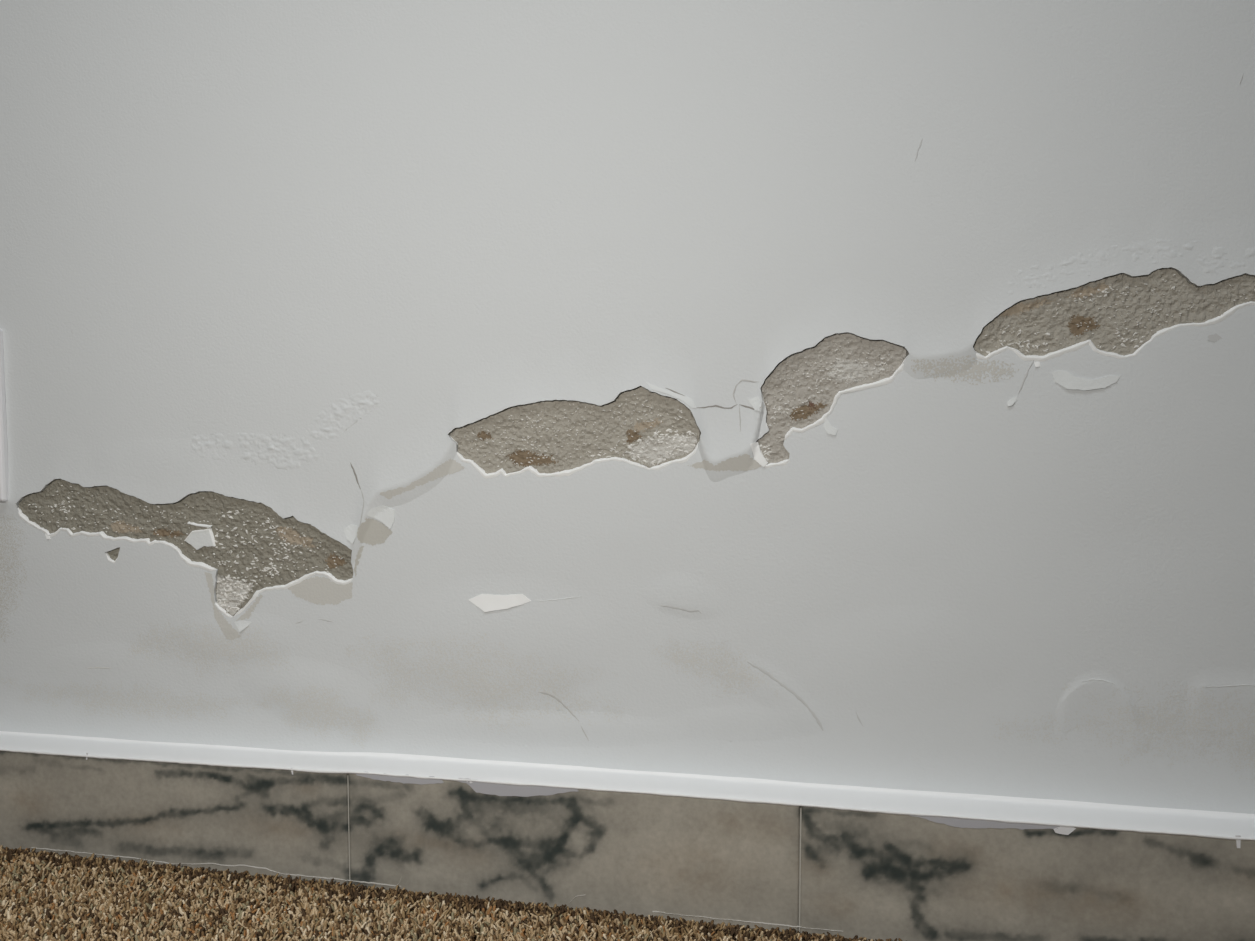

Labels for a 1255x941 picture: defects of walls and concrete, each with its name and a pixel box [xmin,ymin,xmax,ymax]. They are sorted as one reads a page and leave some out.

flaking render [973,268,1255,391]
flaking render [450,382,701,478]
flaking render [748,333,909,468]
flaking render [18,479,357,632]
damp [216,575,255,616]
peeling [367,505,395,529]
peeling [469,594,531,612]